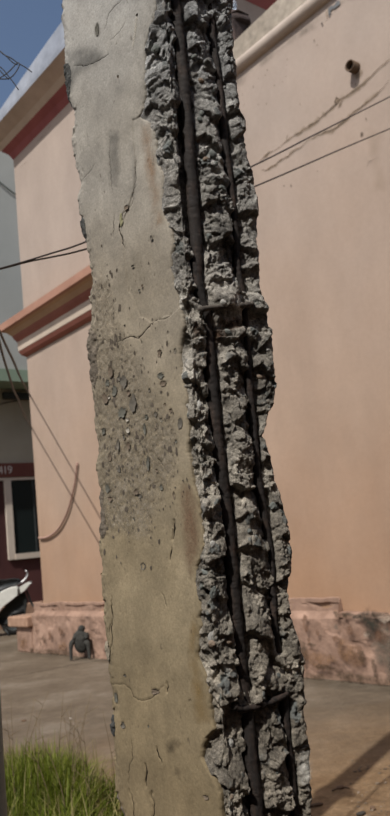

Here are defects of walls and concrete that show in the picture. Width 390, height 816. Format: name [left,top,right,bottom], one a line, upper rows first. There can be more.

crack [259,61,387,170]
spalling [86,0,312,816]
water stain [300,611,390,686]
crack [128,747,162,816]